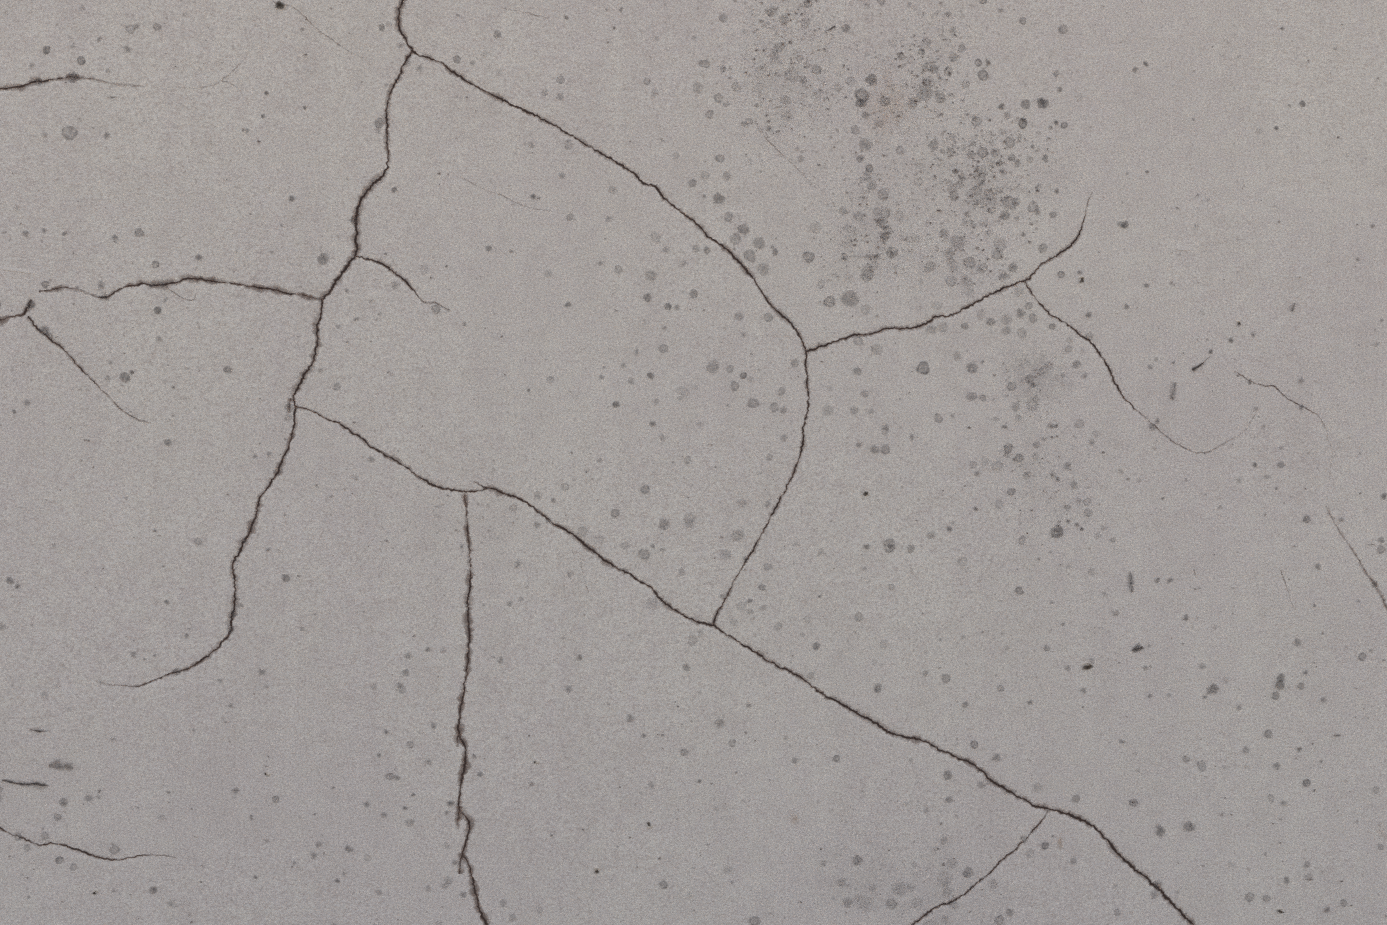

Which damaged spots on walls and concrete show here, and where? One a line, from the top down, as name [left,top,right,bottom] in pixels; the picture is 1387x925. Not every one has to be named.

crack [0,75,105,90]
water stain [717,0,1077,377]
crack [0,286,138,420]
crack [98,0,1194,925]
crack [0,827,147,861]